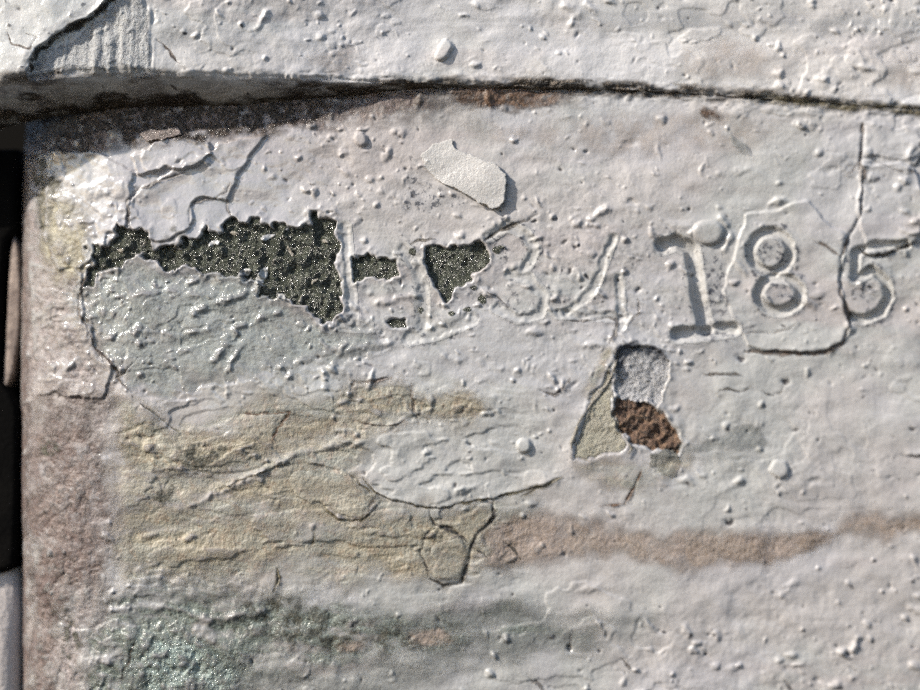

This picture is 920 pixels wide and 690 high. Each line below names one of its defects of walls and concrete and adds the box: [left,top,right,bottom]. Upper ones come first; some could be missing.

crack [7,0,114,73]
peeling [36,0,151,74]
crack [157,40,179,63]
peeling [421,139,507,209]
crack [285,77,920,356]
peeling [85,212,372,398]
peeling [352,253,399,283]
peeling [408,242,505,316]
water stain [0,88,592,690]
crack [544,379,570,397]
peeling [570,340,687,487]
crack [703,372,784,395]